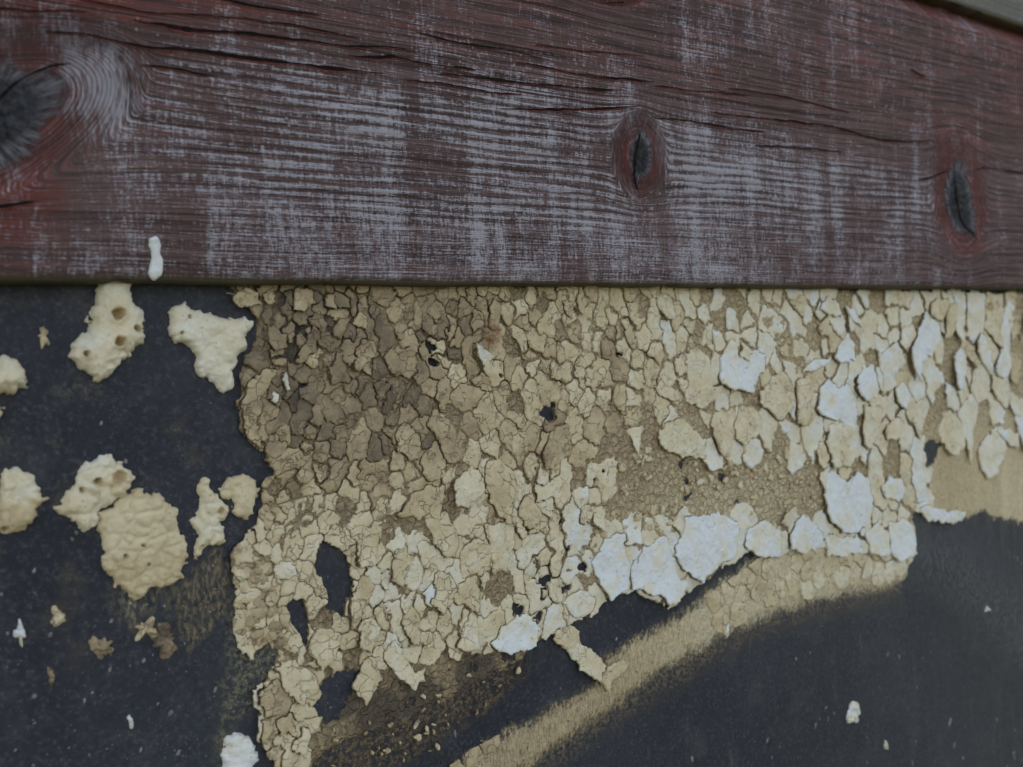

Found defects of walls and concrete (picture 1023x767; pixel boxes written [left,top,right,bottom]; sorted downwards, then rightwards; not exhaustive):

peeling [226,284,1023,767]